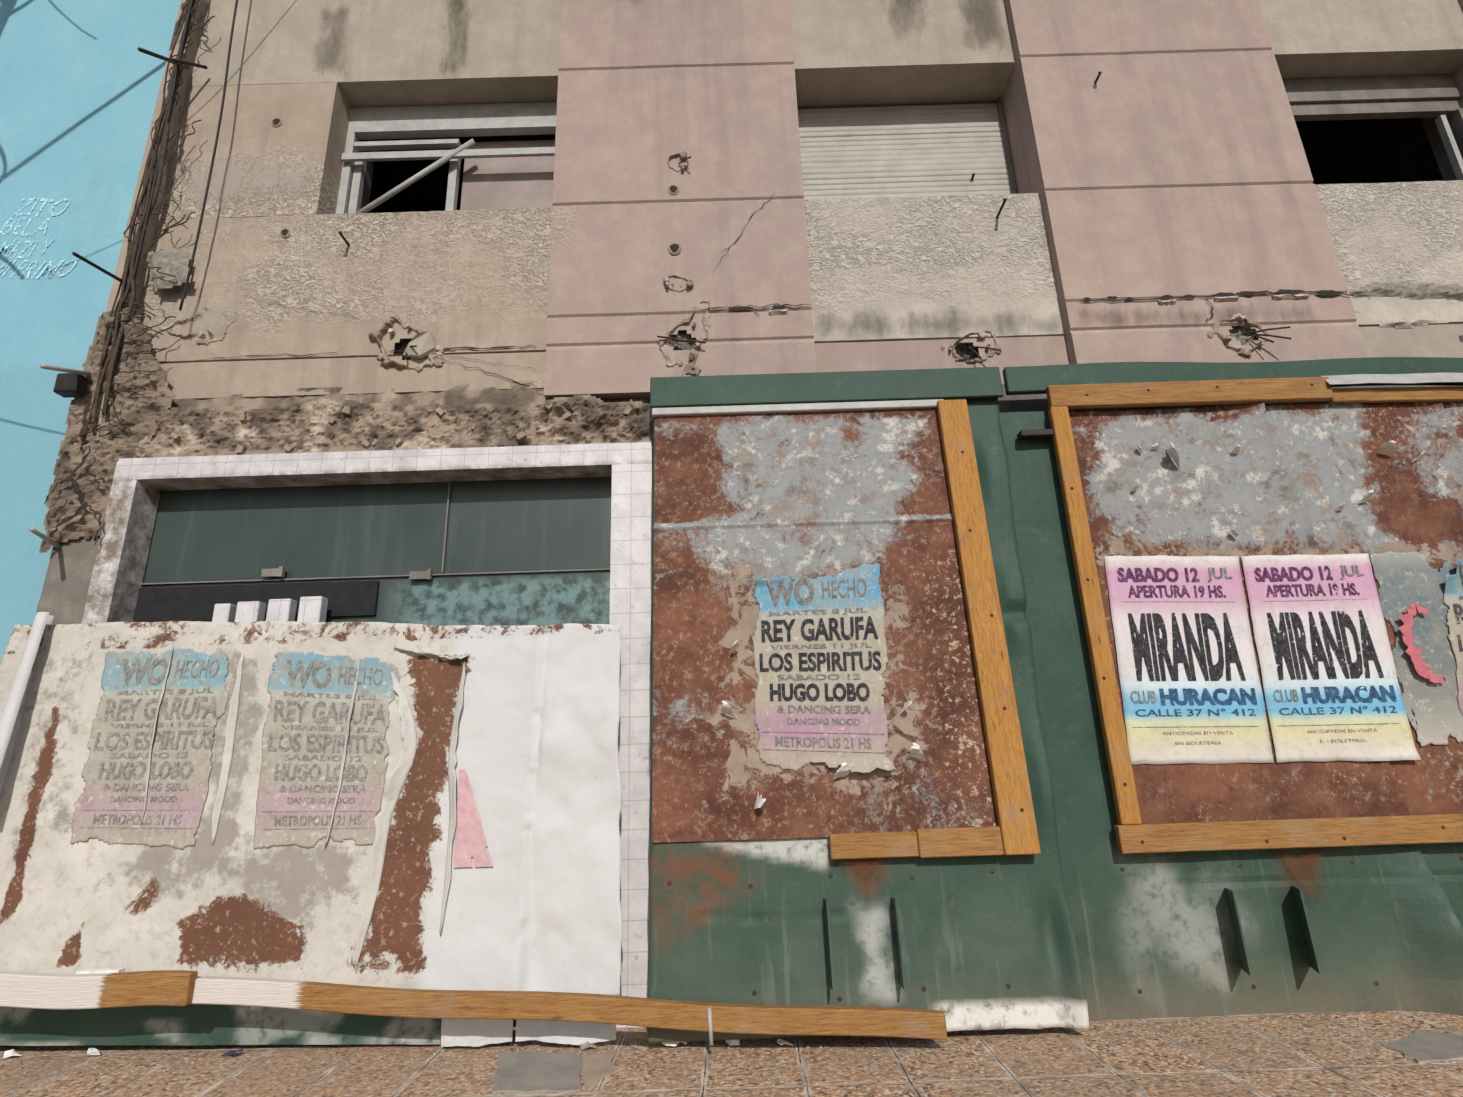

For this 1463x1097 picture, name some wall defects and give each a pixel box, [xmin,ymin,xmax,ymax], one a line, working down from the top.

spalling [667,151,691,173]
peeling [1348,281,1463,302]
spalling [657,275,712,376]
hole [941,330,1001,364]
spalling [1207,313,1291,359]
peeling [1379,318,1449,329]
spalling [39,306,653,553]